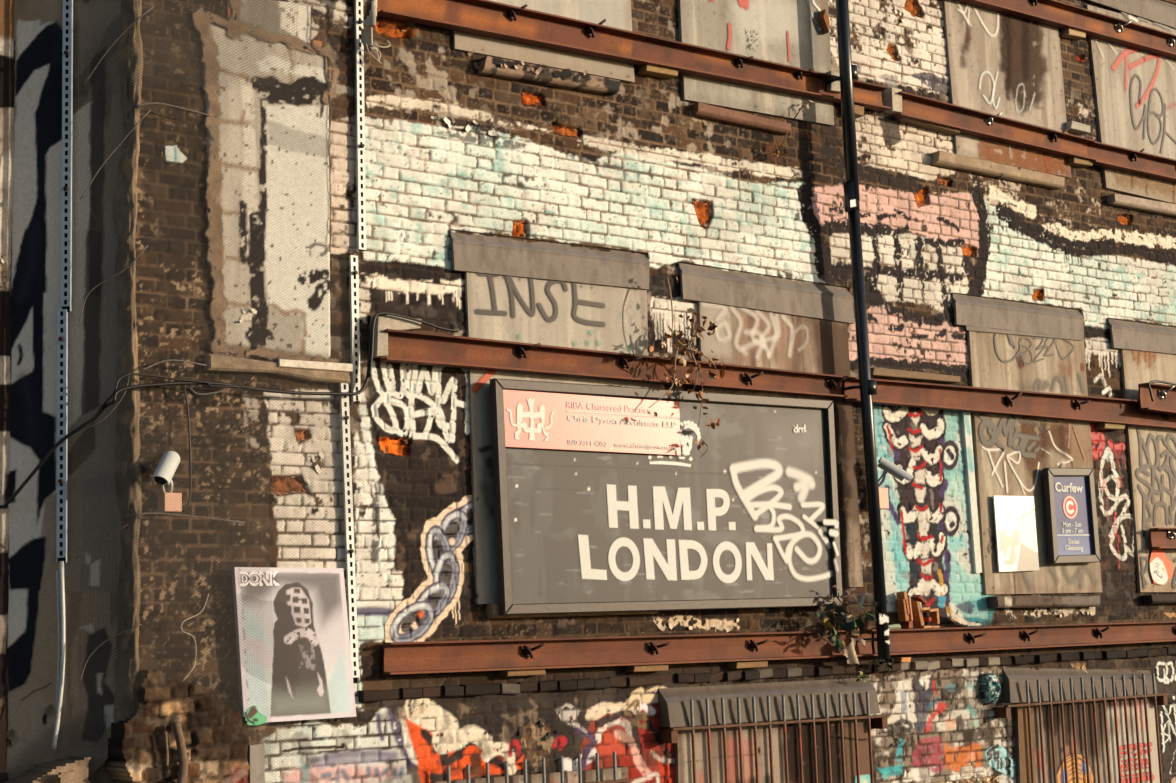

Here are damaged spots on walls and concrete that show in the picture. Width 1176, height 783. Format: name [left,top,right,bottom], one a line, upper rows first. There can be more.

spalling [521,91,544,106]
peeling [431,116,500,139]
spalling [552,123,581,138]
spalling [692,198,713,229]
spalling [512,220,528,238]